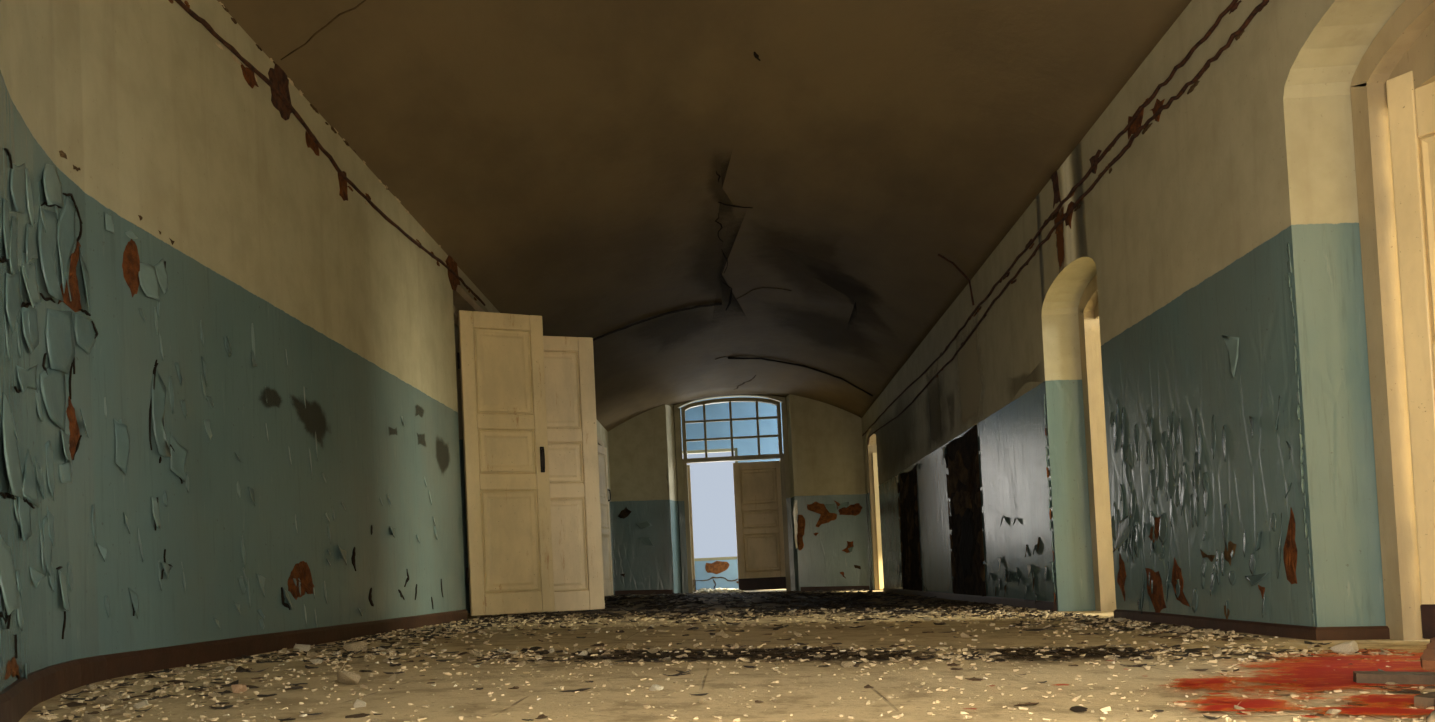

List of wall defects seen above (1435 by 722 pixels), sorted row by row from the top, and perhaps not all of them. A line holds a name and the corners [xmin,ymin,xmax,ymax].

crack [281,0,366,60]
rust [1054,207,1064,270]
peeling [104,212,189,493]
peeling [0,150,96,680]
water stain [261,388,328,446]
peeling [1110,243,1315,627]
peeling [793,500,863,551]
peeling [895,464,926,592]
peeling [942,395,1056,604]
peeling [283,561,327,626]
peeling [705,561,739,584]